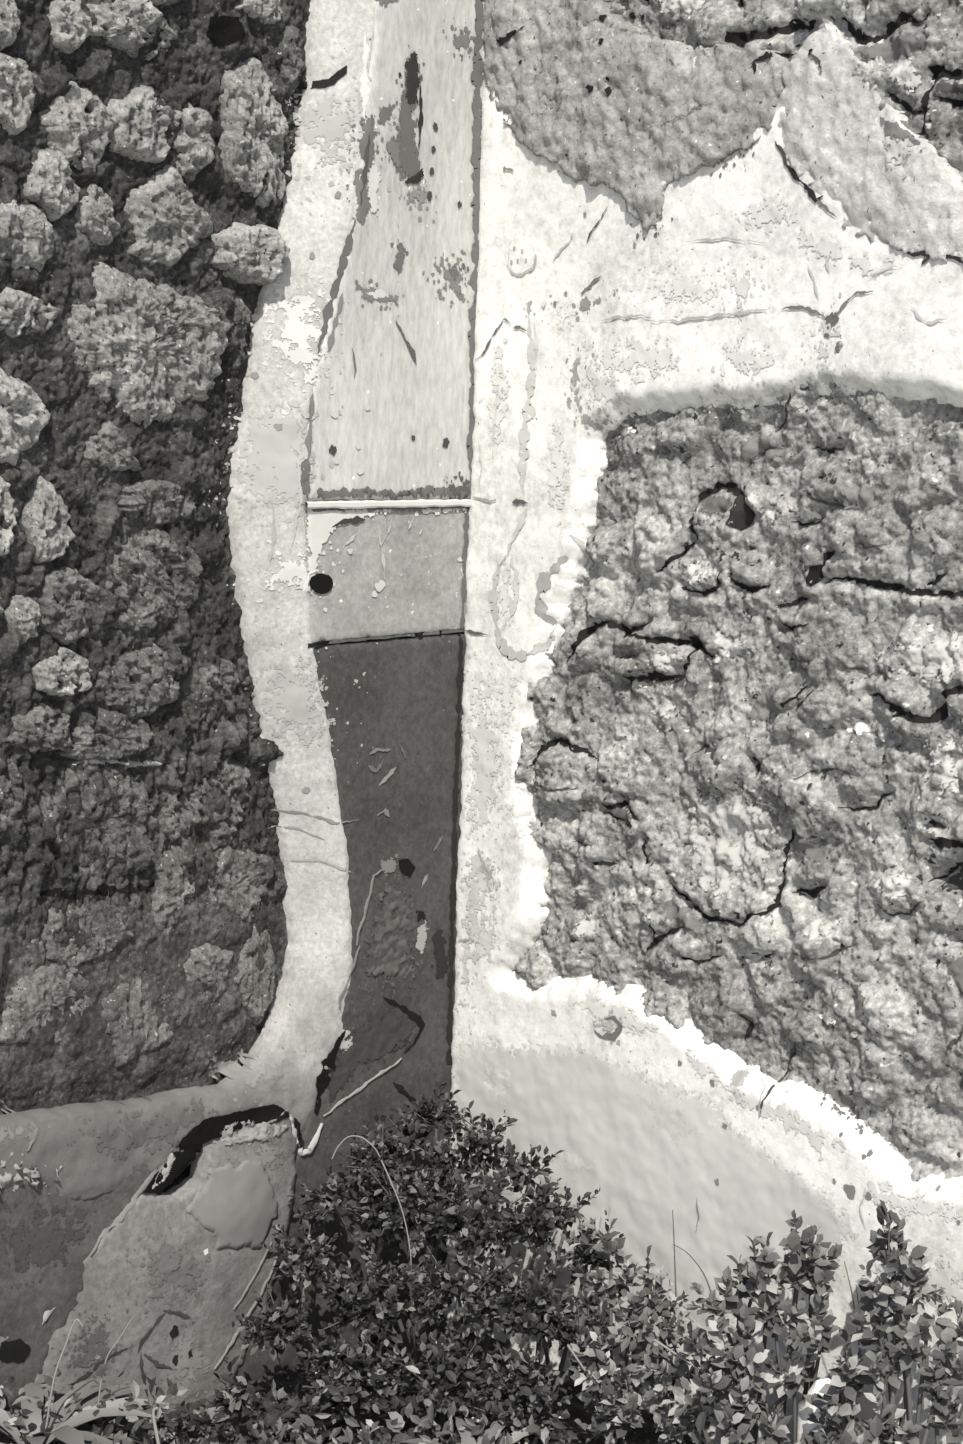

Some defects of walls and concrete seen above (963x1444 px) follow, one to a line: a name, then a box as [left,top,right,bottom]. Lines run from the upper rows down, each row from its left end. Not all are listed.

spalling [334,36,438,224]
spalling [857,23,963,182]
crack [580,141,963,325]
spalling [699,414,902,533]
crack [656,393,963,631]
crack [567,620,716,684]
flaking render [617,618,754,736]
crack [846,667,963,723]
crack [532,738,892,965]
flaking render [642,755,787,940]
crack [873,820,963,916]
flaking render [874,720,963,920]